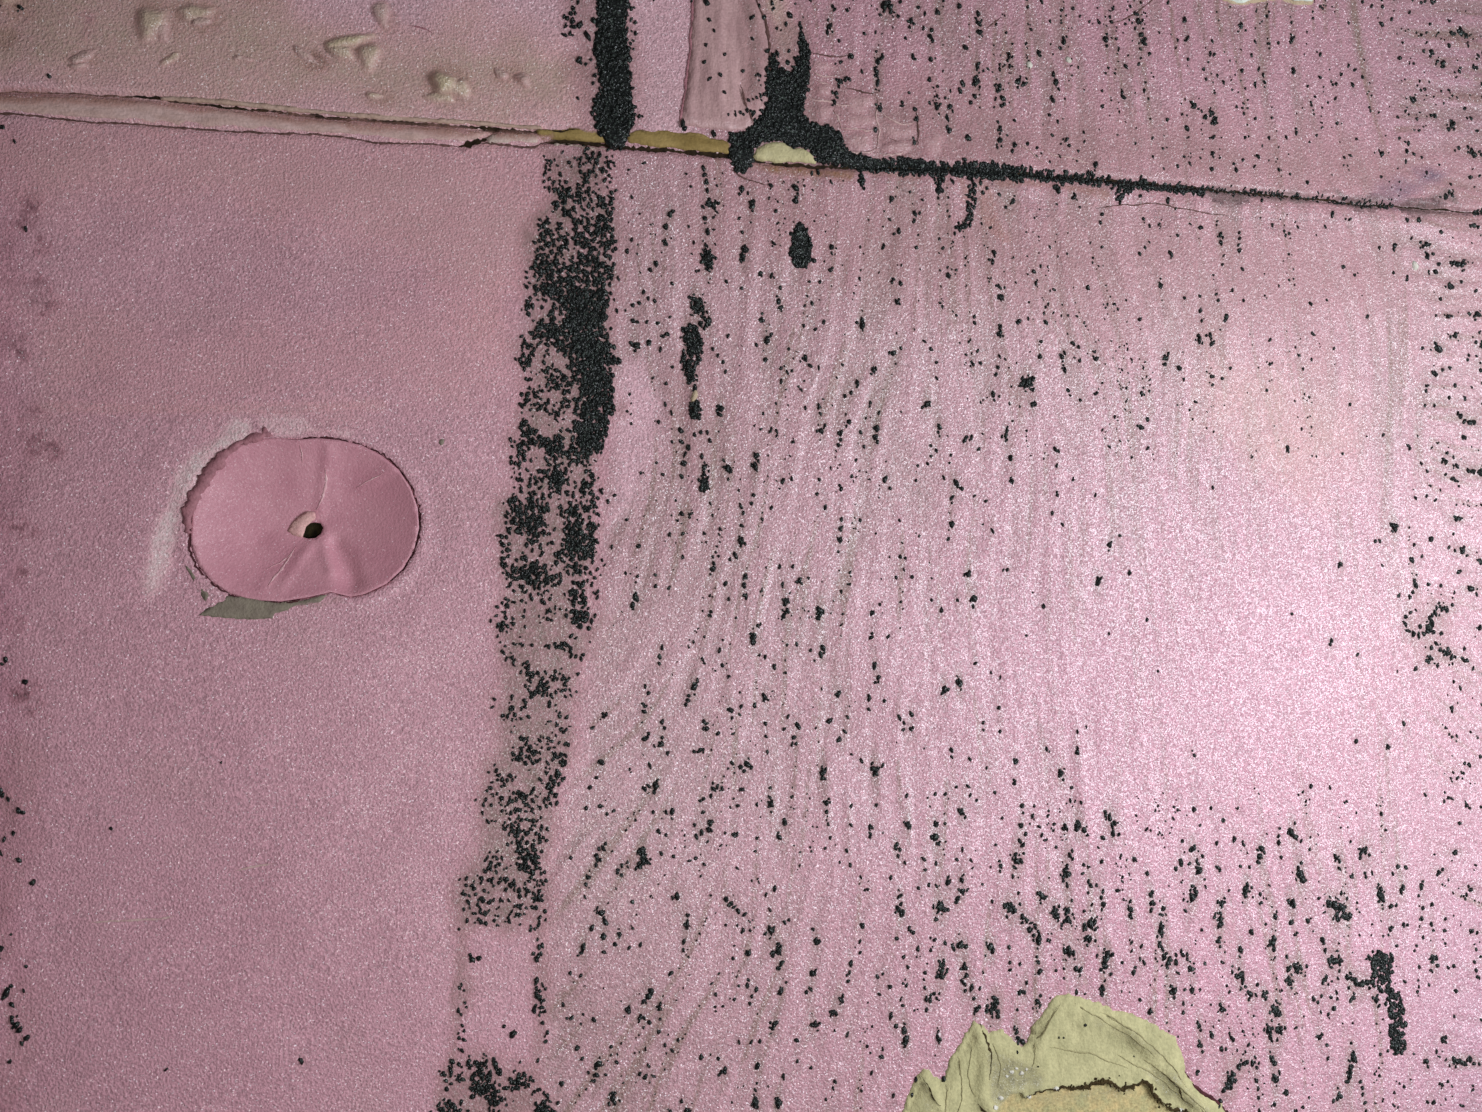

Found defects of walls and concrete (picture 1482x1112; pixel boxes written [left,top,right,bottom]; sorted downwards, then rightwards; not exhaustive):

crack [0,91,949,185]
crack [991,172,1481,216]
peeling [185,565,327,620]
leakage [749,552,852,674]
leakage [804,366,892,522]
leakage [914,255,1060,541]
leakage [1059,332,1185,459]
leakage [1374,217,1482,826]
leakage [568,662,887,987]
leakage [575,866,790,1112]
peeling [902,993,1229,1112]
leakage [849,758,1482,1112]